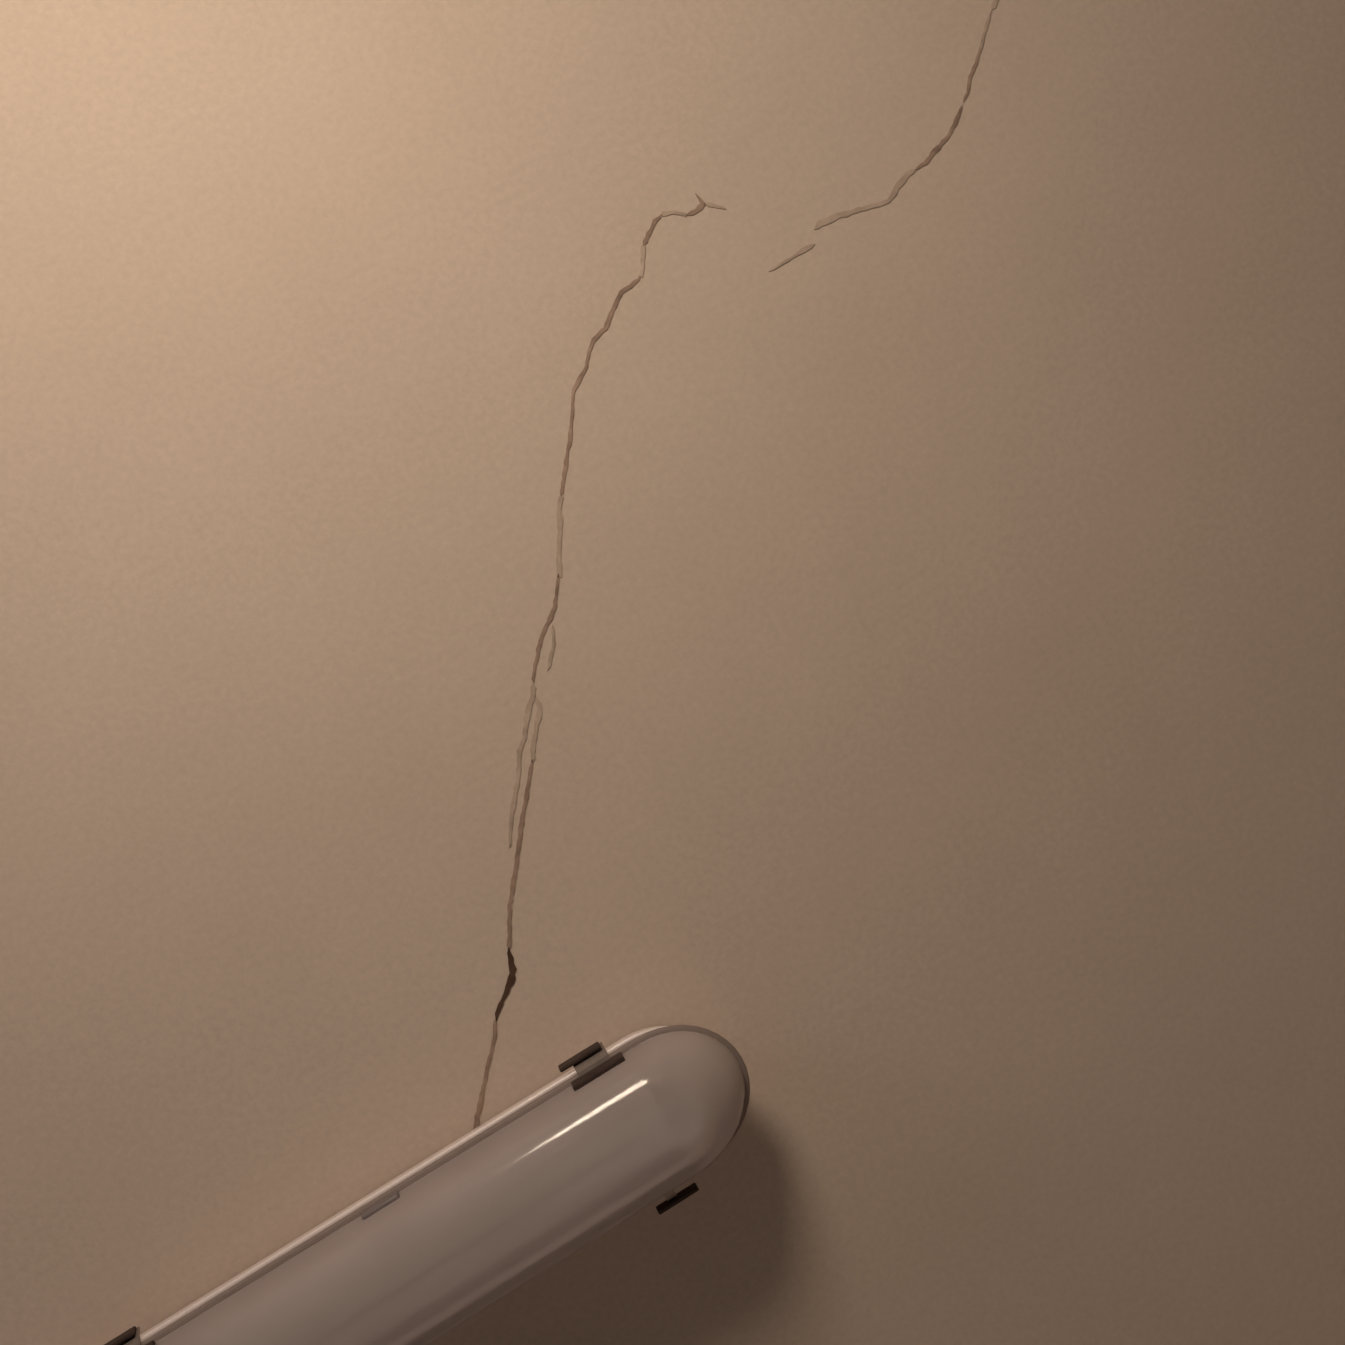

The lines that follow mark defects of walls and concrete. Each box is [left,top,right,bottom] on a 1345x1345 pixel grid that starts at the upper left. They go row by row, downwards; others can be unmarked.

crack [769,0,998,271]
crack [473,193,726,1129]